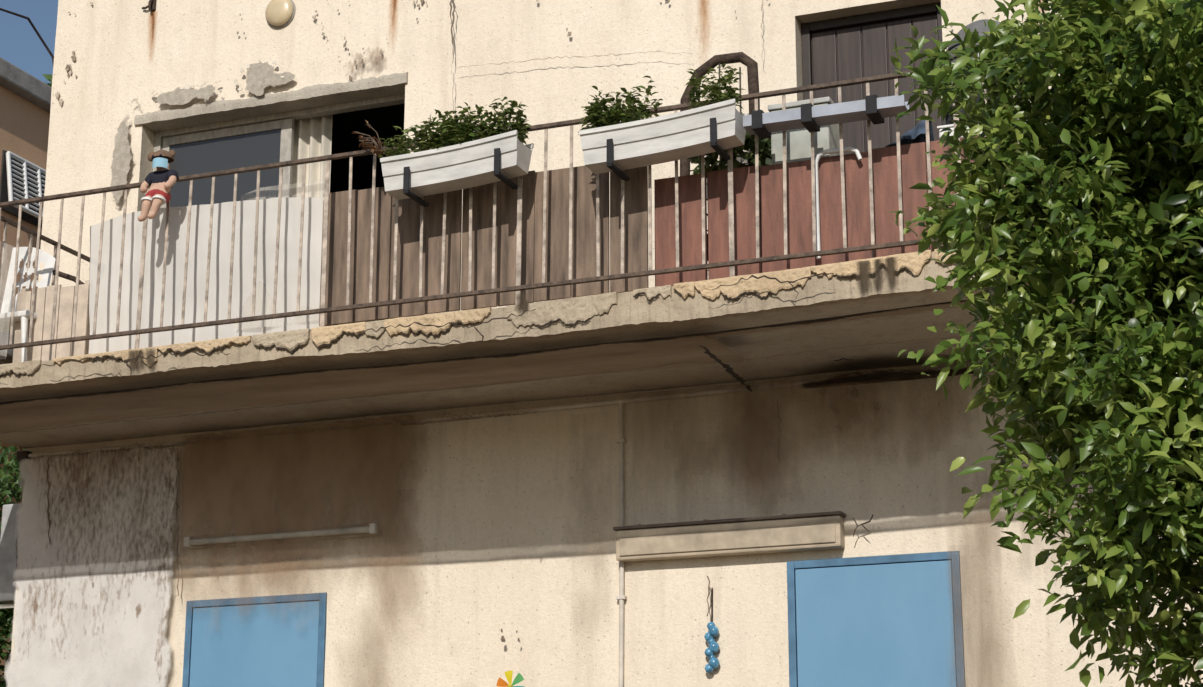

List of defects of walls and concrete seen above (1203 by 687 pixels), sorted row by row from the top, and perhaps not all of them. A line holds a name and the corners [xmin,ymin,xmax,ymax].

spalling [111,60,295,203]
spalling [0,292,618,376]
water stain [0,299,973,433]
water stain [517,293,528,311]
spalling [633,249,956,301]
water stain [859,257,895,292]
water stain [102,413,518,580]